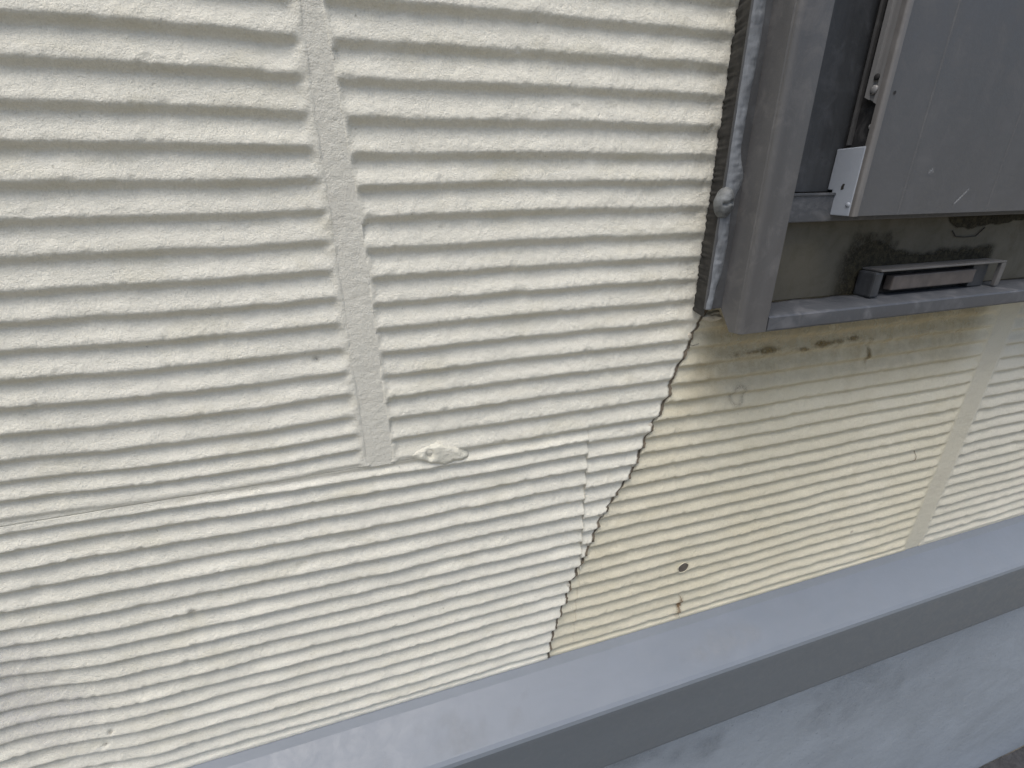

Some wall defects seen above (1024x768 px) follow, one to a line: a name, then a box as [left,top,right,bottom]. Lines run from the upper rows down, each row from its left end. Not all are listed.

crack [546,310,708,658]